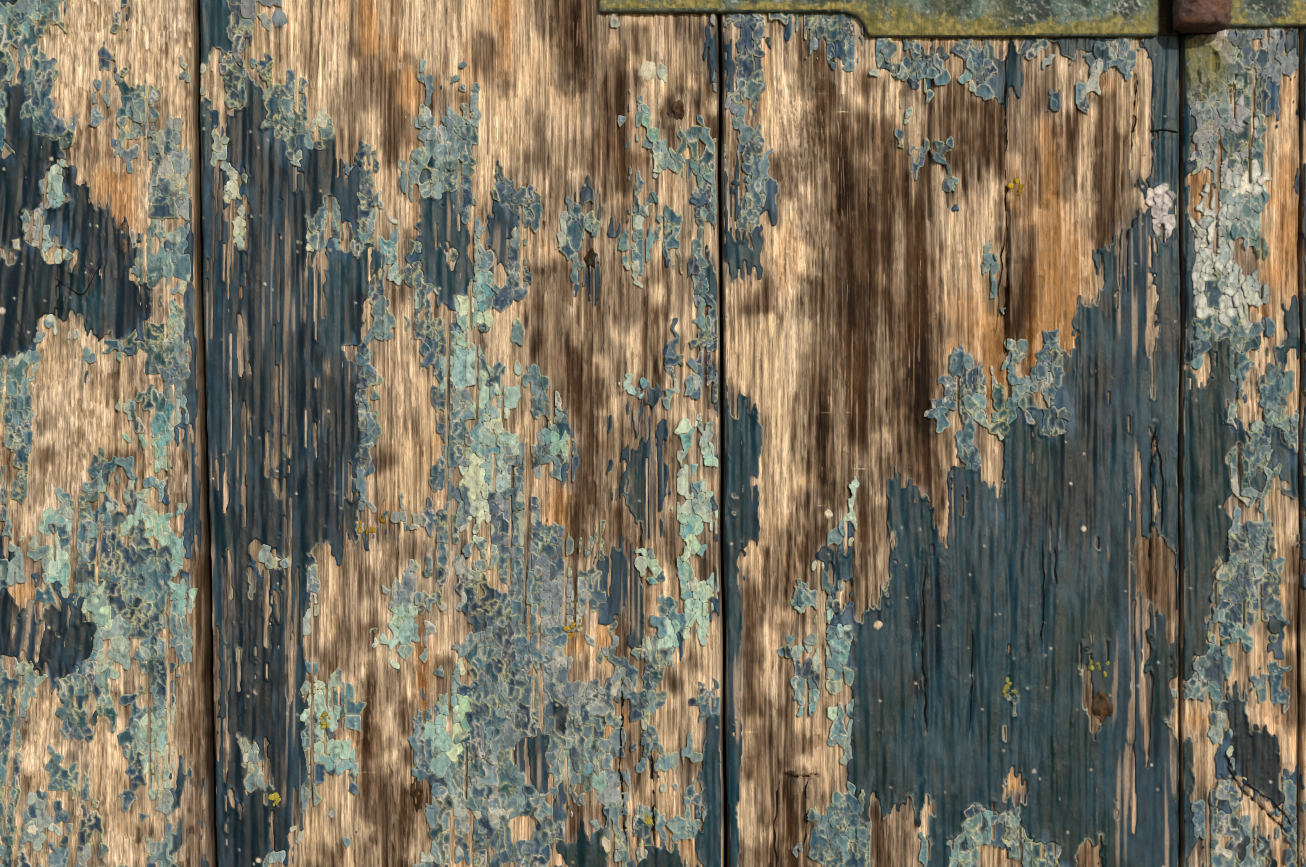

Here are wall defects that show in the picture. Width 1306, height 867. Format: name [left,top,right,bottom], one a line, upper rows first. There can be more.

peeling [0,0,866,867]
peeling [777,27,1306,867]